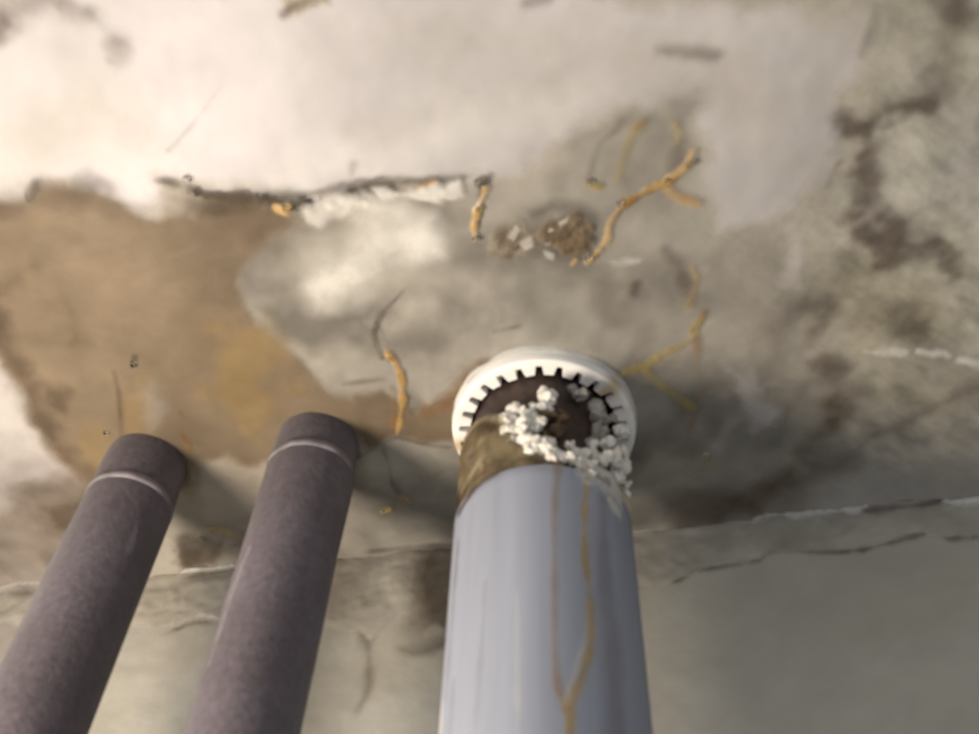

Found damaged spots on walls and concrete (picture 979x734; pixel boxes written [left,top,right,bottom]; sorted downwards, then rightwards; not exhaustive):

spalling [489,207,595,260]
leakage [0,179,491,493]
leakage [812,355,849,374]
crack [347,296,451,514]
leakage [819,394,852,432]
leakage [499,384,632,498]
leakage [48,499,82,531]
leakage [668,478,979,529]